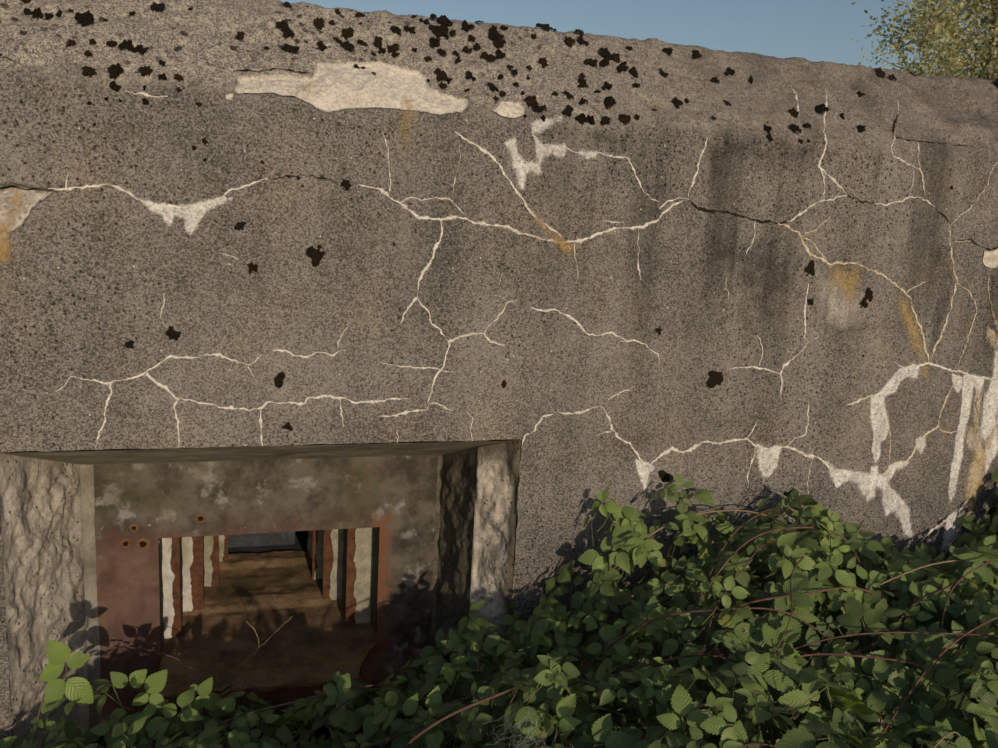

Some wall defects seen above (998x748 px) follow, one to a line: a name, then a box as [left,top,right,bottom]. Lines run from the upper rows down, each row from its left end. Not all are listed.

crack [103,80,168,98]
spalling [225,60,469,115]
spalling [493,100,526,118]
leakage [505,116,566,189]
spalling [0,183,54,241]
leakage [143,196,232,235]
spalling [983,248,998,268]
crack [0,89,998,544]
leakage [826,366,920,536]
leakage [941,327,998,552]
rust [965,449,986,516]